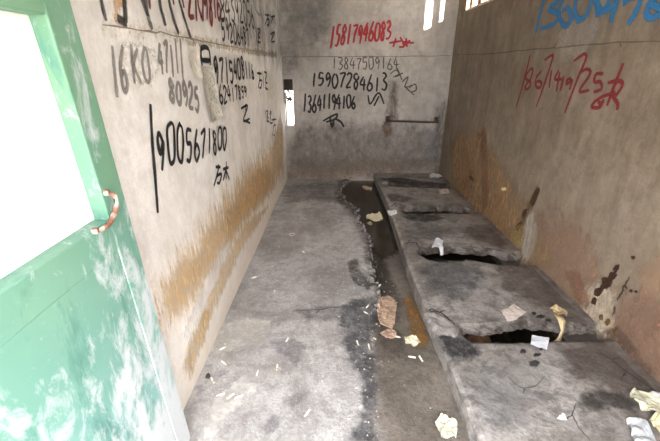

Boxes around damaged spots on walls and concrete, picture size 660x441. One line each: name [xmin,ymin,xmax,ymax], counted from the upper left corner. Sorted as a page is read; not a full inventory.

rust [161,125,284,375]
damp [288,124,447,441]
rust [404,297,428,346]
flaking render [591,264,619,305]